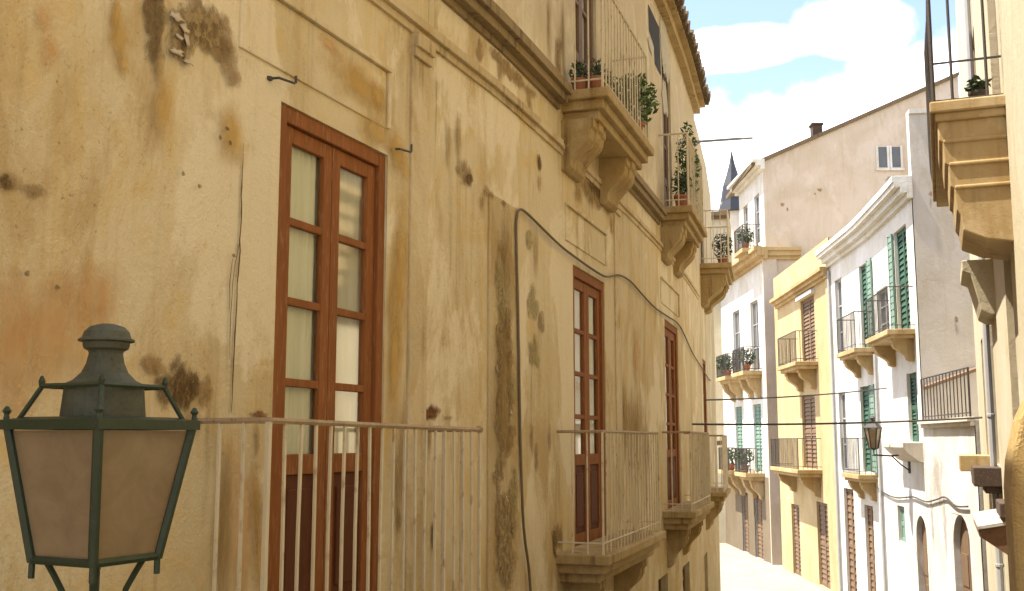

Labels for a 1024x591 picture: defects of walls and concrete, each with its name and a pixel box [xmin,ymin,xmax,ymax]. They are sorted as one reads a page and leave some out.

flaking render [143,0,241,86]
damp [0,175,45,196]
flaking render [219,115,240,152]
damp [448,124,473,186]
crack [229,144,244,412]
damp [144,357,212,420]